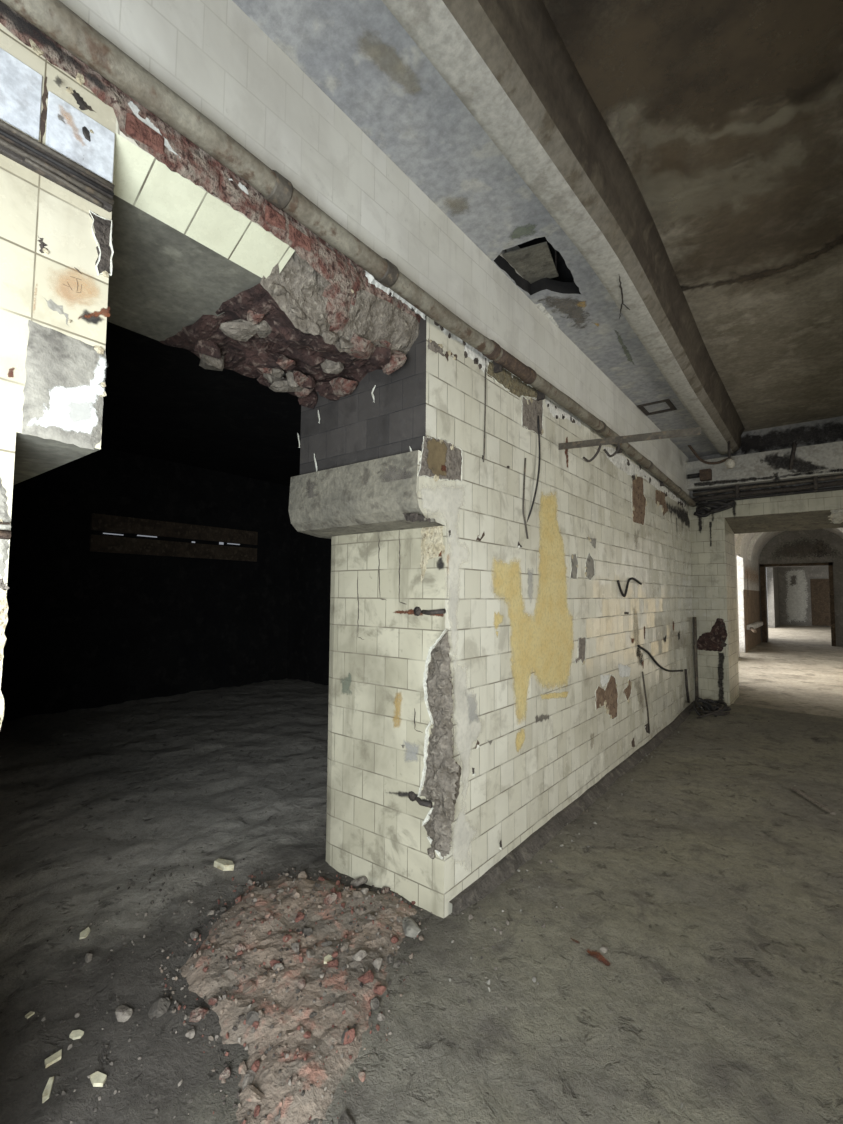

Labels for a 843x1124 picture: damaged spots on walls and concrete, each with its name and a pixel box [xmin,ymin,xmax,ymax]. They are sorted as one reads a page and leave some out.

spalling [0,1,581,450]
damp [511,224,535,239]
damp [542,0,843,291]
peeling [0,477,12,671]
spalling [418,629,476,860]
peeling [595,664,632,720]
peeling [603,446,687,526]
spalling [693,618,727,652]